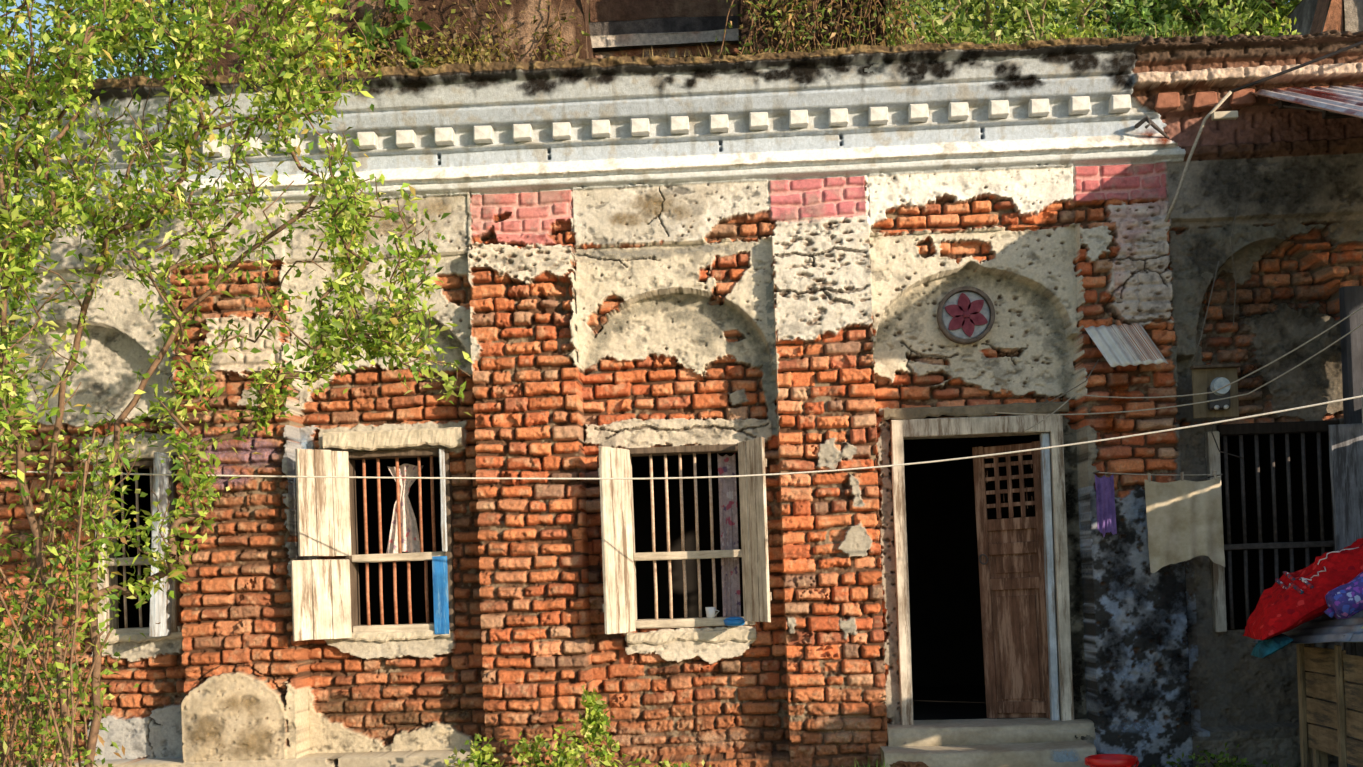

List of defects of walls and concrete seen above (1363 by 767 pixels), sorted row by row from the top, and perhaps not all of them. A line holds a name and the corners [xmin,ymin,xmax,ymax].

leakage [349,78,433,94]
leakage [464,75,496,88]
leakage [519,69,614,95]
leakage [659,68,717,90]
leakage [736,51,1043,91]
corrosion [1292,88,1337,100]
crack [647,186,666,225]
spalling [1200,220,1363,425]
spalling [0,193,1191,767]
leakage [1065,472,1193,719]